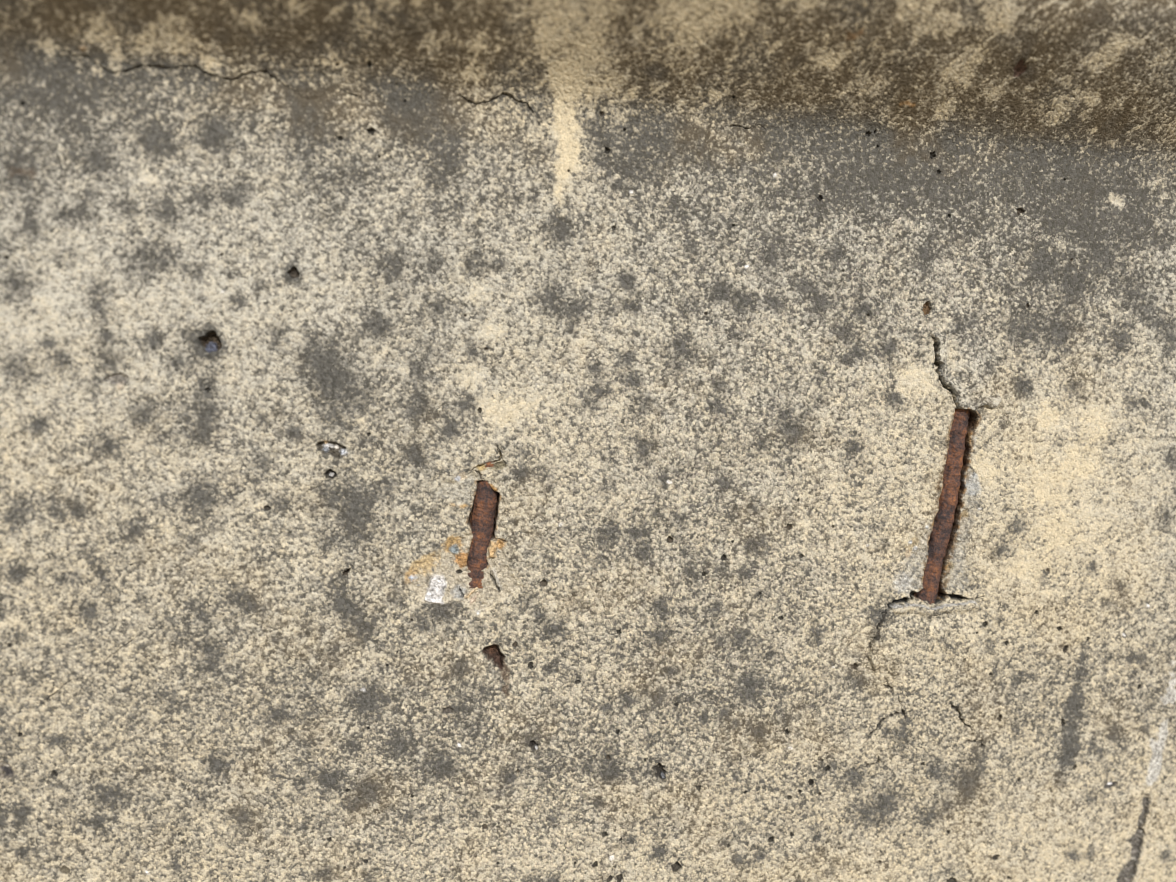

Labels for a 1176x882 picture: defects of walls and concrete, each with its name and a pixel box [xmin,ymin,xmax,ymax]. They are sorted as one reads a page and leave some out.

spalling [401,441,529,620]
corrosion [467,461,498,588]
spalling [889,406,986,603]
corrosion [914,409,970,605]